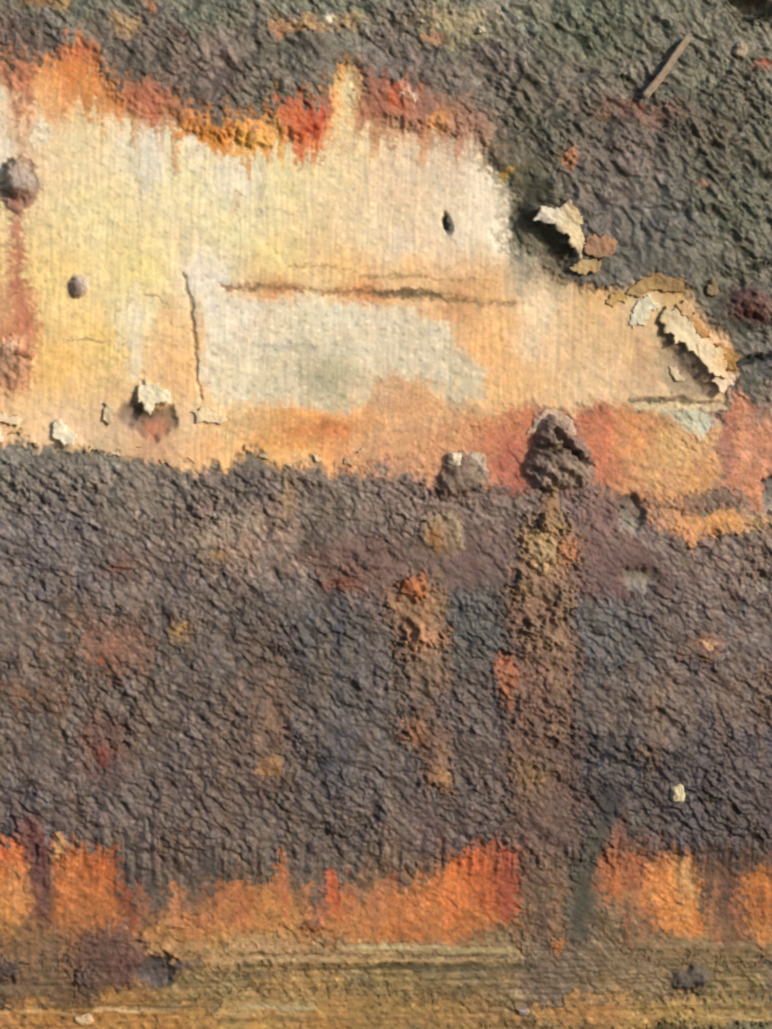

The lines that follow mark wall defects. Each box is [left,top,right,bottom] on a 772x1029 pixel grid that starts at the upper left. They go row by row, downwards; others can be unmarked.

corrosion [0,0,518,400]
peeling [0,94,746,482]
corrosion [0,366,772,1008]
spalling [760,475,772,514]